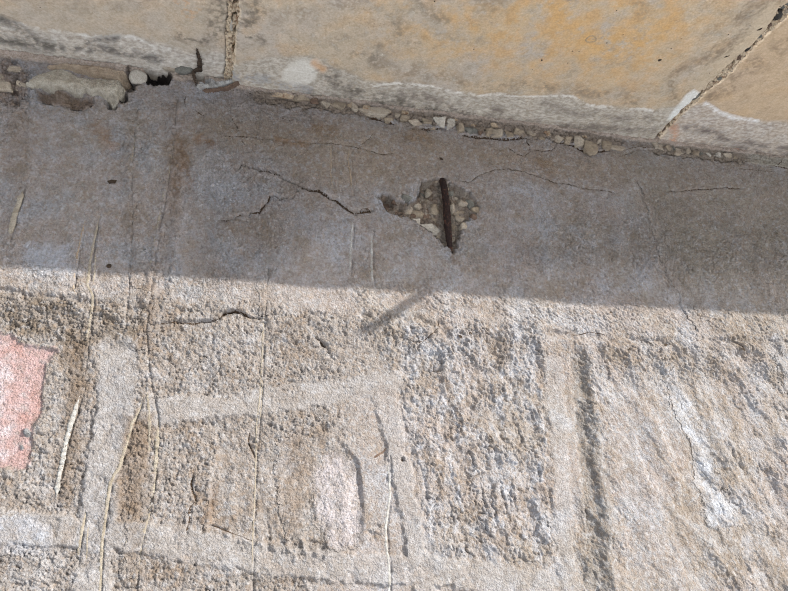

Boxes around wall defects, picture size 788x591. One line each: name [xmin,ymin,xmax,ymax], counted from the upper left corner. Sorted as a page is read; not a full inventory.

spalling [0,58,95,111]
peeling [197,78,240,94]
crack [301,117,396,155]
crack [462,135,654,194]
crack [223,196,271,222]
crack [302,188,371,214]
spalling [377,179,480,253]
rust [439,178,461,266]
crack [160,310,251,325]